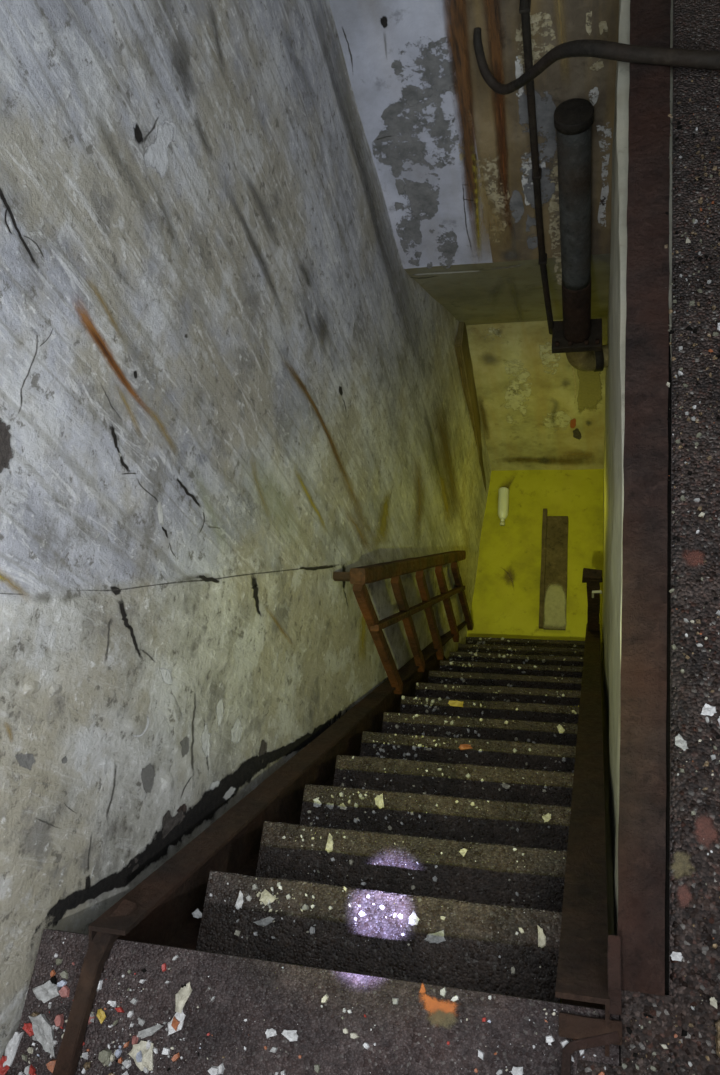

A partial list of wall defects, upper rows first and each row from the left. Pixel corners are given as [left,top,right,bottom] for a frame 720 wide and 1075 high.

corrosion [445,0,477,212]
peeling [372,12,562,285]
corrosion [485,0,511,225]
crack [0,189,44,263]
corrosion [78,310,140,424]
peeling [539,342,560,375]
spalling [0,418,13,473]
crack [103,388,218,556]
crack [86,565,348,661]